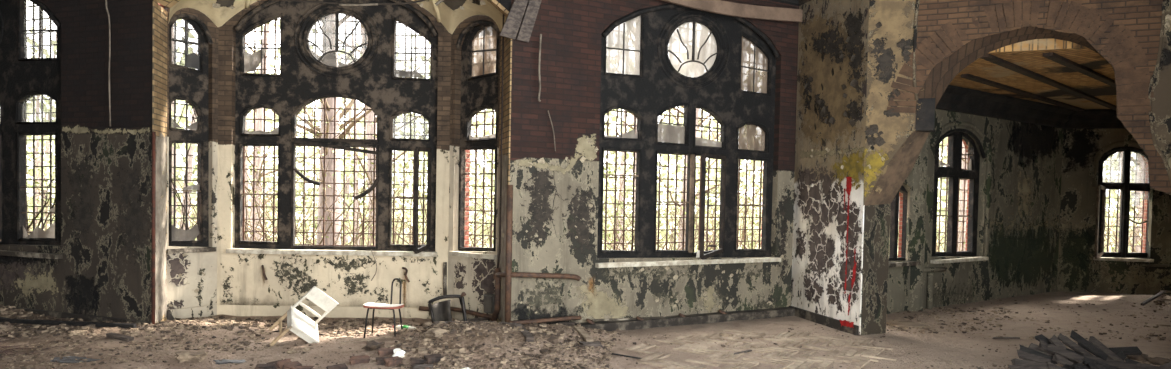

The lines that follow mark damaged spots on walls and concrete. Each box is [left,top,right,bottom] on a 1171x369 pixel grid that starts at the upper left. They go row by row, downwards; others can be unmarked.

flaking render [212,0,236,9]
flaking render [419,0,486,11]
flaking render [62,125,150,136]
peeling [514,138,599,257]
peeling [158,253,206,310]
peeling [221,254,255,304]
peeling [272,255,430,304]
peeling [419,258,503,309]
peeling [520,279,565,314]